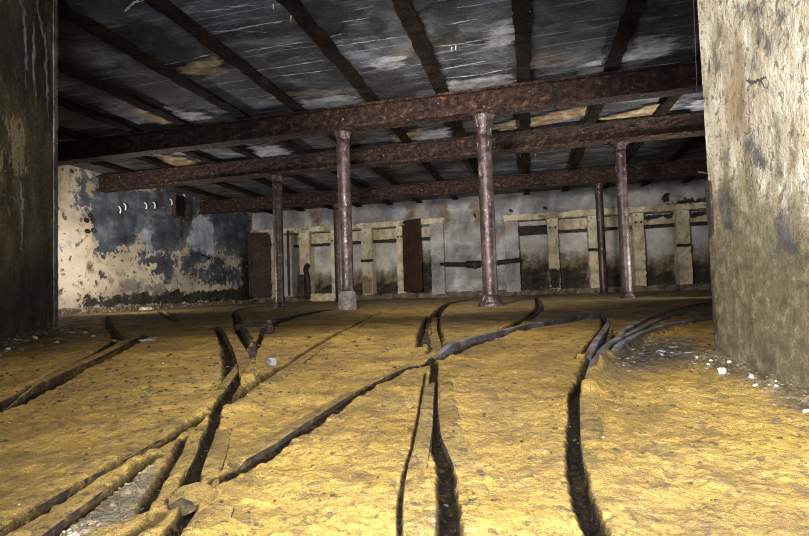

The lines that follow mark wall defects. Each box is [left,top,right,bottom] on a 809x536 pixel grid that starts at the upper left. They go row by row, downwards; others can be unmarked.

damp [485,19,515,48]
damp [0,0,52,117]
damp [366,56,407,69]
rust [389,129,424,143]
rust [495,120,520,133]
rust [530,106,591,127]
peeling [69,168,252,290]
damp [520,252,589,289]
damp [606,258,621,287]